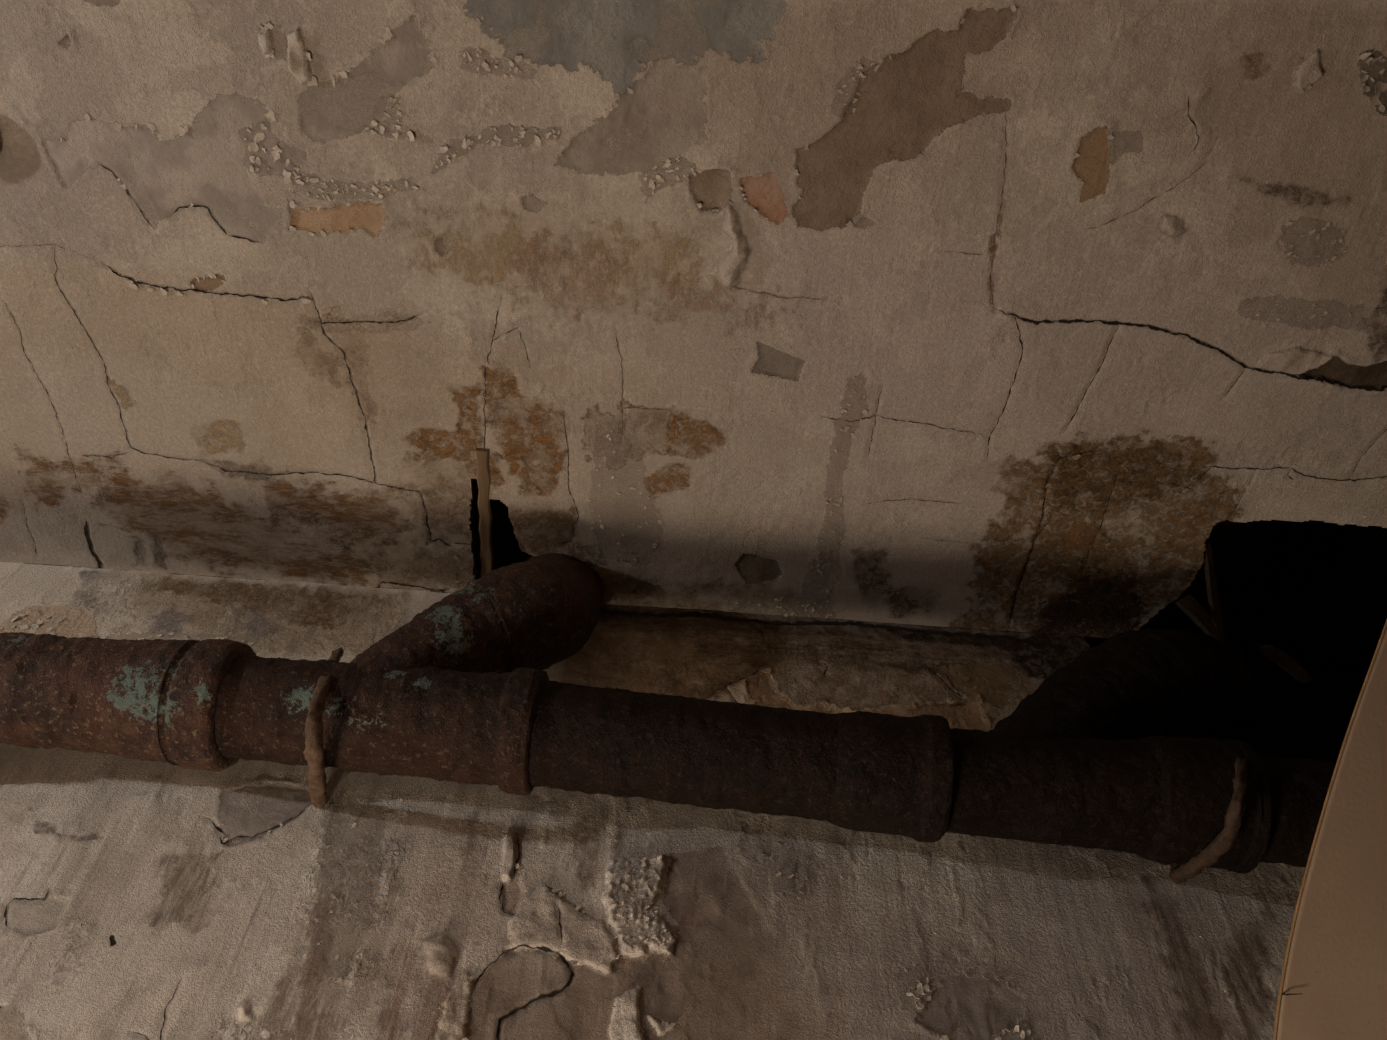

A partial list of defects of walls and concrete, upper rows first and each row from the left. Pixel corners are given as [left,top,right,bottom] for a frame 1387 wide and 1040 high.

flaking render [244,123,418,237]
peeling [435,0,1019,232]
flaking render [1072,124,1143,202]
peeling [1357,51,1387,116]
crack [0,244,467,547]
crack [602,97,1387,703]
crack [84,521,102,568]
crack [377,582,451,592]
leakage [887,431,1242,651]
crack [474,840,574,1040]
peeling [435,829,804,1040]
peeling [995,1025,1031,1040]